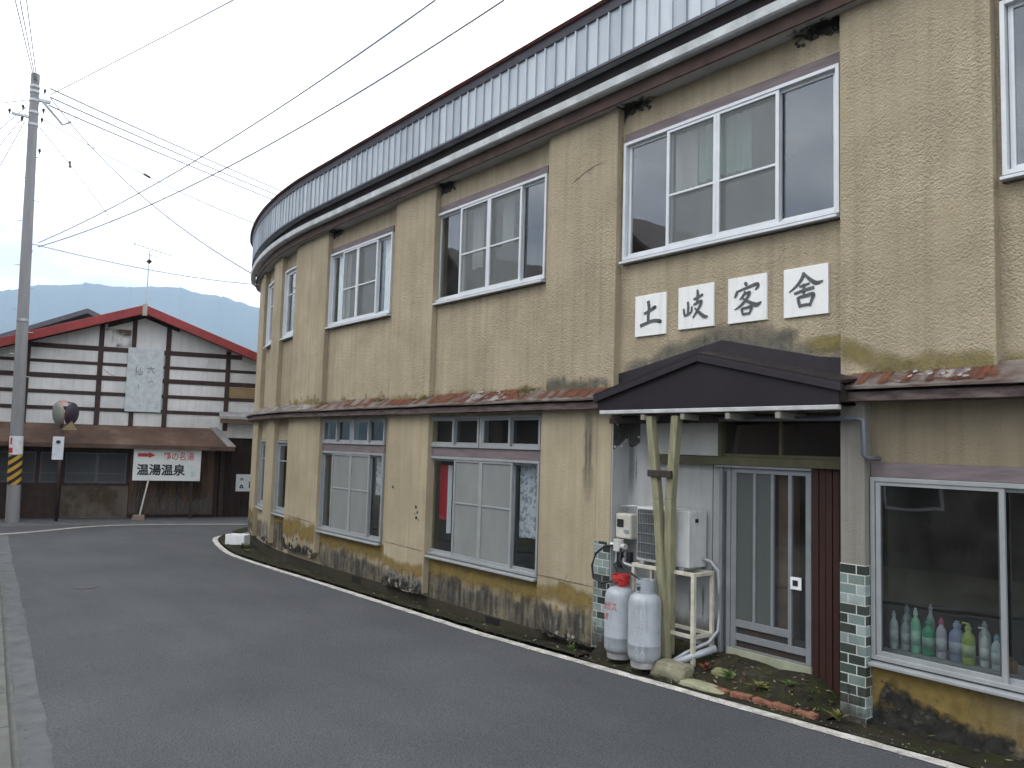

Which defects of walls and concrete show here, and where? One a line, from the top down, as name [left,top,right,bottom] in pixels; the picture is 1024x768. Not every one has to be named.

water stain [629,330,813,371]
rust [856,366,999,384]
rust [315,387,607,409]
water stain [319,547,604,646]
water stain [840,680,1024,762]